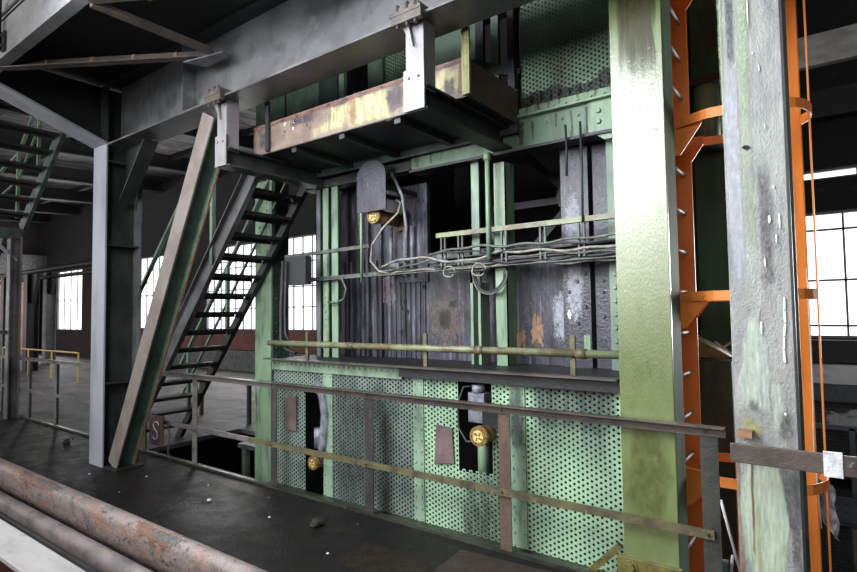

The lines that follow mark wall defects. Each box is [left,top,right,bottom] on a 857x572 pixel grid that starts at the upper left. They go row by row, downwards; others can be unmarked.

corrosion [255,79,401,146]
corrosion [435,58,462,94]
damp [717,0,750,279]
corrosion [517,312,544,348]
damp [739,313,788,433]
damp [740,464,802,572]